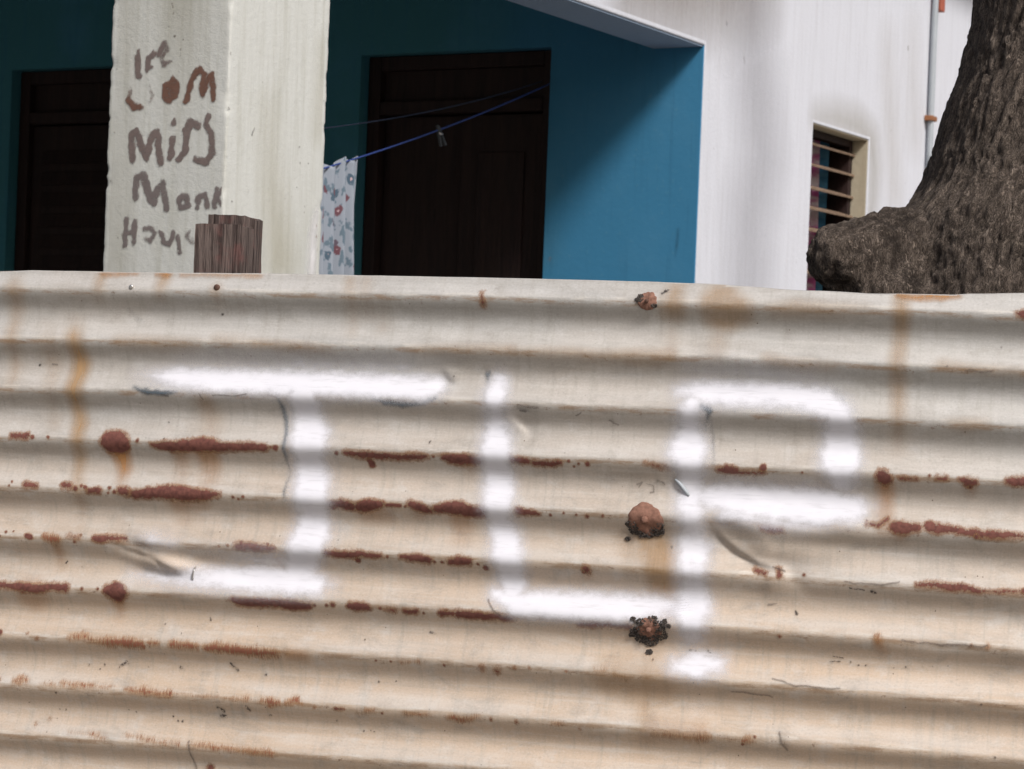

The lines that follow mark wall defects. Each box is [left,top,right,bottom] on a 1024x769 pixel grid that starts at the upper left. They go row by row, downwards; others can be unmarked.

corrosion [99,428,278,471]
corrosion [334,450,483,468]
corrosion [508,455,590,468]
corrosion [874,467,979,489]
corrosion [60,481,244,502]
corrosion [327,498,487,519]
corrosion [865,516,1024,540]
corrosion [323,550,489,571]
corrosion [0,581,83,594]
corrosion [97,580,128,603]
corrosion [914,581,1024,595]
corrosion [229,596,514,622]